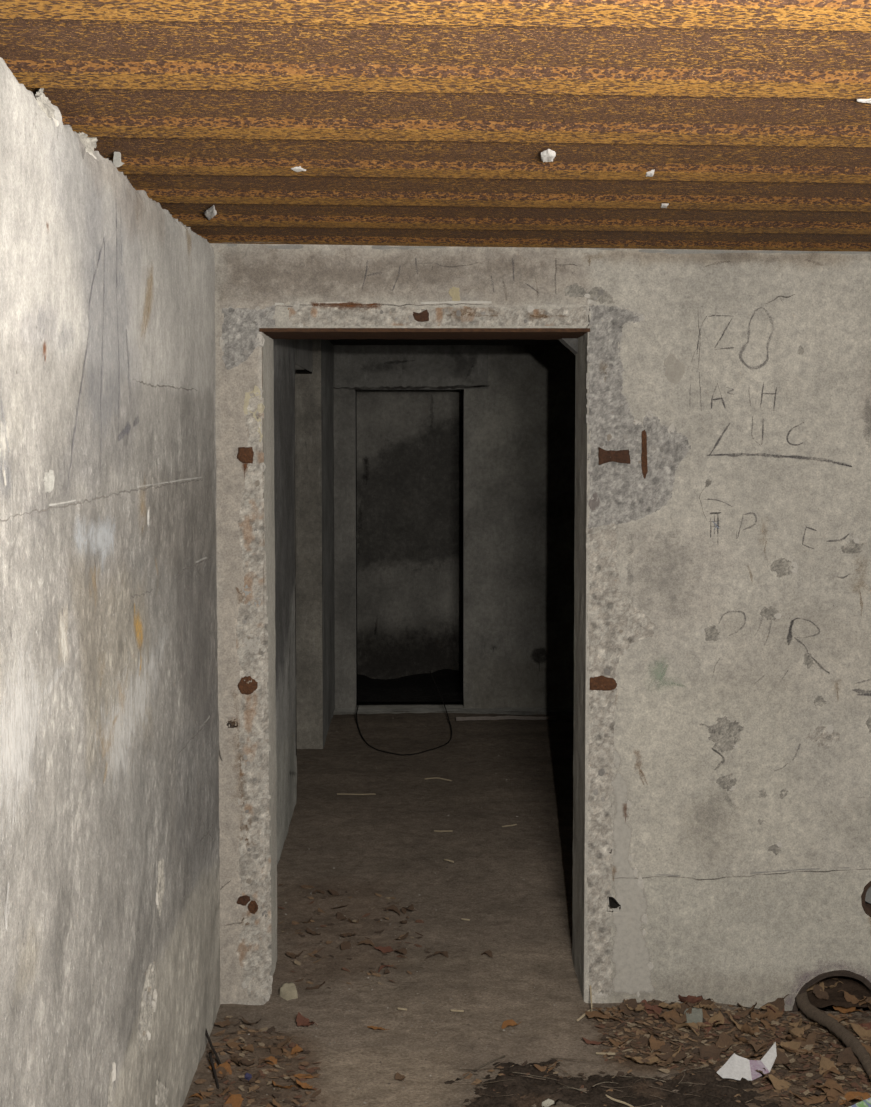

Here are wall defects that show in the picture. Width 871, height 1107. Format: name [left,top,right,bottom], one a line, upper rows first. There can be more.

crack [0,480,199,521]
spalling [219,283,691,1002]
crack [765,868,864,876]